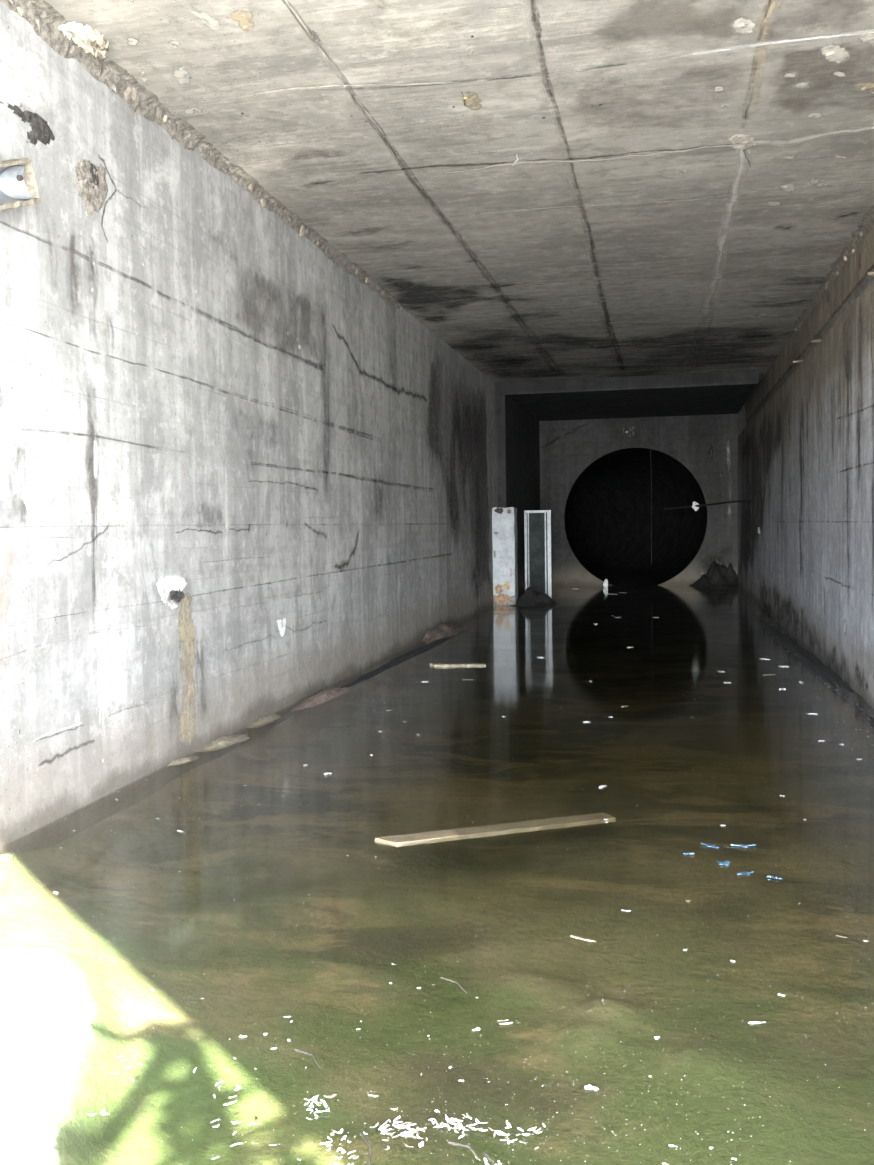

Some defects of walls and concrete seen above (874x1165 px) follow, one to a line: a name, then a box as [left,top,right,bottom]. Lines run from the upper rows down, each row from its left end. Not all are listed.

leakage [605,0,739,40]
leakage [781,49,864,106]
peeling [821,44,848,76]
spalling [0,0,403,313]
leakage [386,266,532,321]
crack [351,88,874,367]
leakage [453,328,787,378]
leakage [727,402,808,572]
leakage [831,306,874,561]
rust [173,595,205,744]